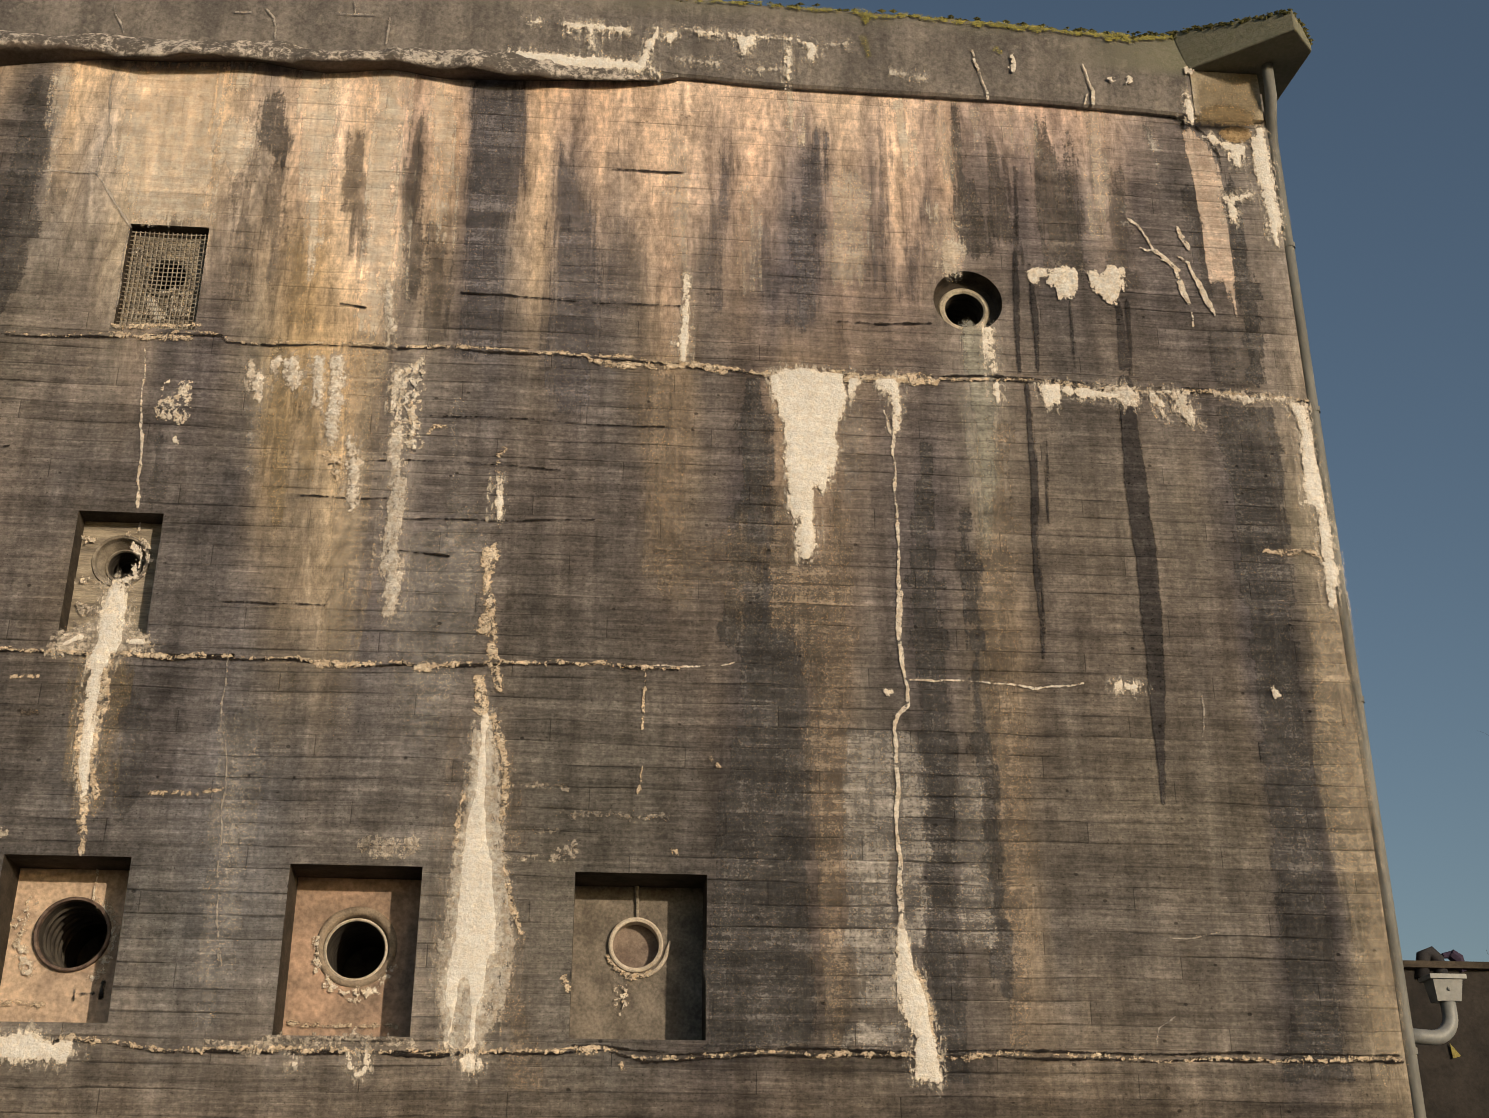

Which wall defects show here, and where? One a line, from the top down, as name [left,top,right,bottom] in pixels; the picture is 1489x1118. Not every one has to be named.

leakage [0,64,72,314]
efflorescence [57,574,150,855]
leakage [116,61,527,620]
crack [1,73,777,531]
leakage [540,144,602,414]
crack [0,369,1406,1090]
leakage [703,364,902,1054]
crack [837,319,932,327]
leakage [926,101,1090,659]
crack [1127,218,1216,327]
leakage [1097,91,1355,1085]